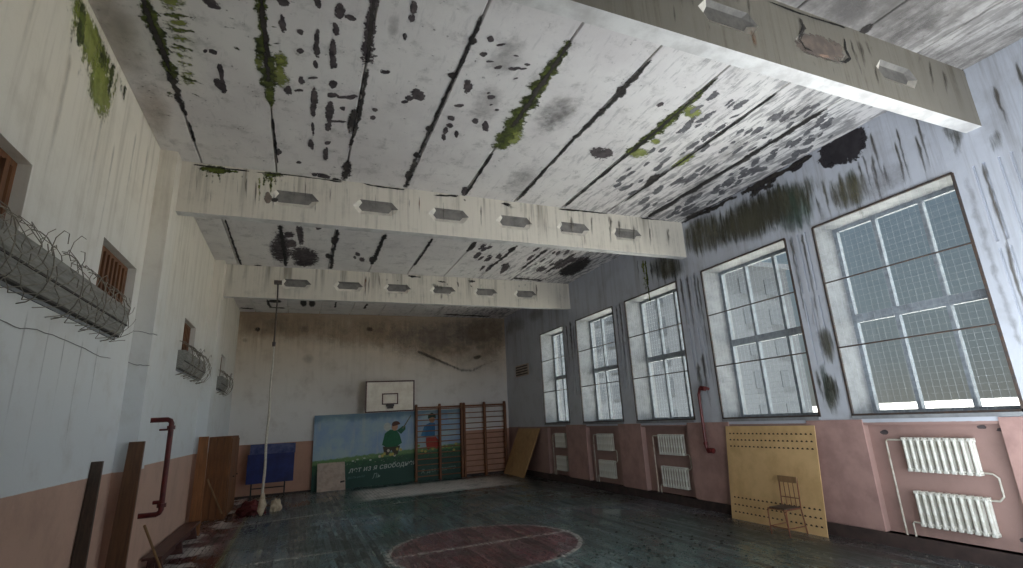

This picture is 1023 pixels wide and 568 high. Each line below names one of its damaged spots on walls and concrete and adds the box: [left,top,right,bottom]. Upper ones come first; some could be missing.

water stain [71,0,127,99]
water stain [141,0,196,142]
water stain [256,0,278,107]
water stain [510,41,571,128]
water stain [589,147,613,160]
peeling [613,90,868,219]
water stain [682,139,836,228]